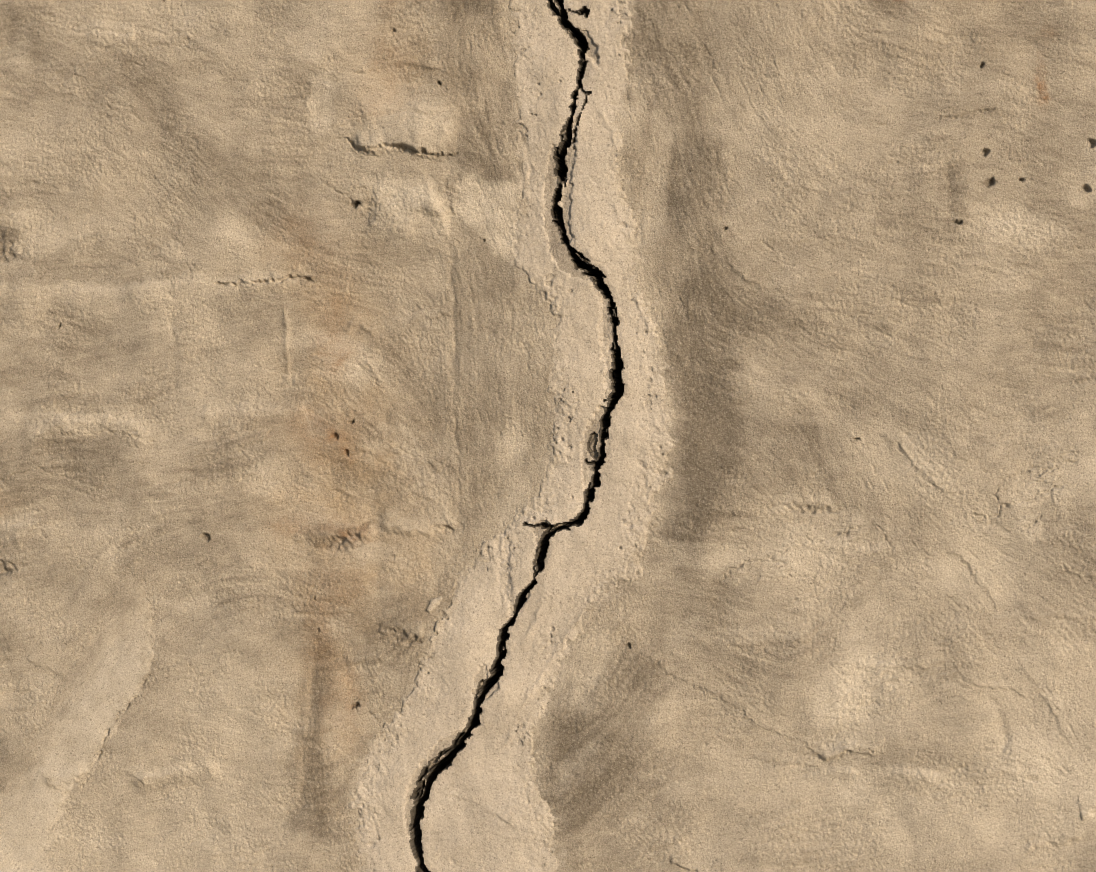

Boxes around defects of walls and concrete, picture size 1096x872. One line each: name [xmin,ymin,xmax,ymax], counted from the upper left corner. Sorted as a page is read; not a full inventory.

crack [346,137,459,158]
crack [409,0,625,872]